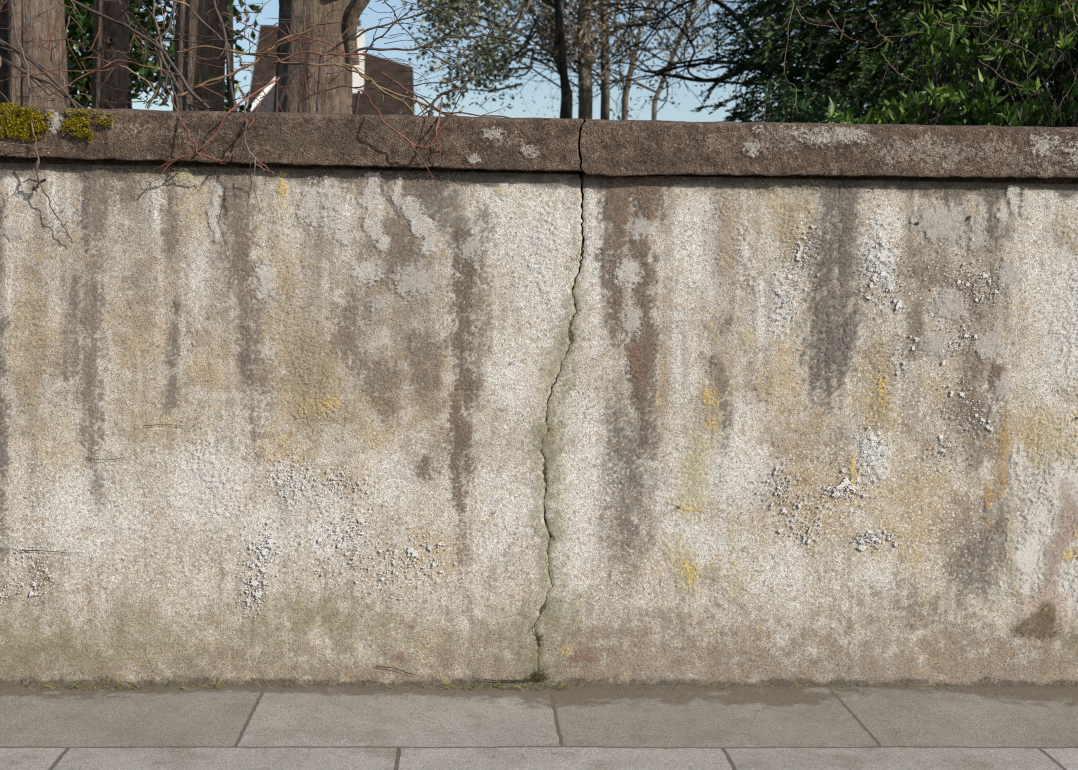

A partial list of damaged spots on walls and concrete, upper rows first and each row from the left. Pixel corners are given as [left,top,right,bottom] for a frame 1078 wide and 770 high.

damp [0,316,12,531]
damp [52,166,138,517]
damp [159,168,183,259]
damp [162,295,182,414]
damp [211,169,280,458]
damp [320,171,501,588]
crack [477,118,585,685]
damp [798,181,869,423]
damp [908,297,926,360]
damp [904,183,1009,324]
damp [945,344,1006,471]
damp [856,471,1015,634]